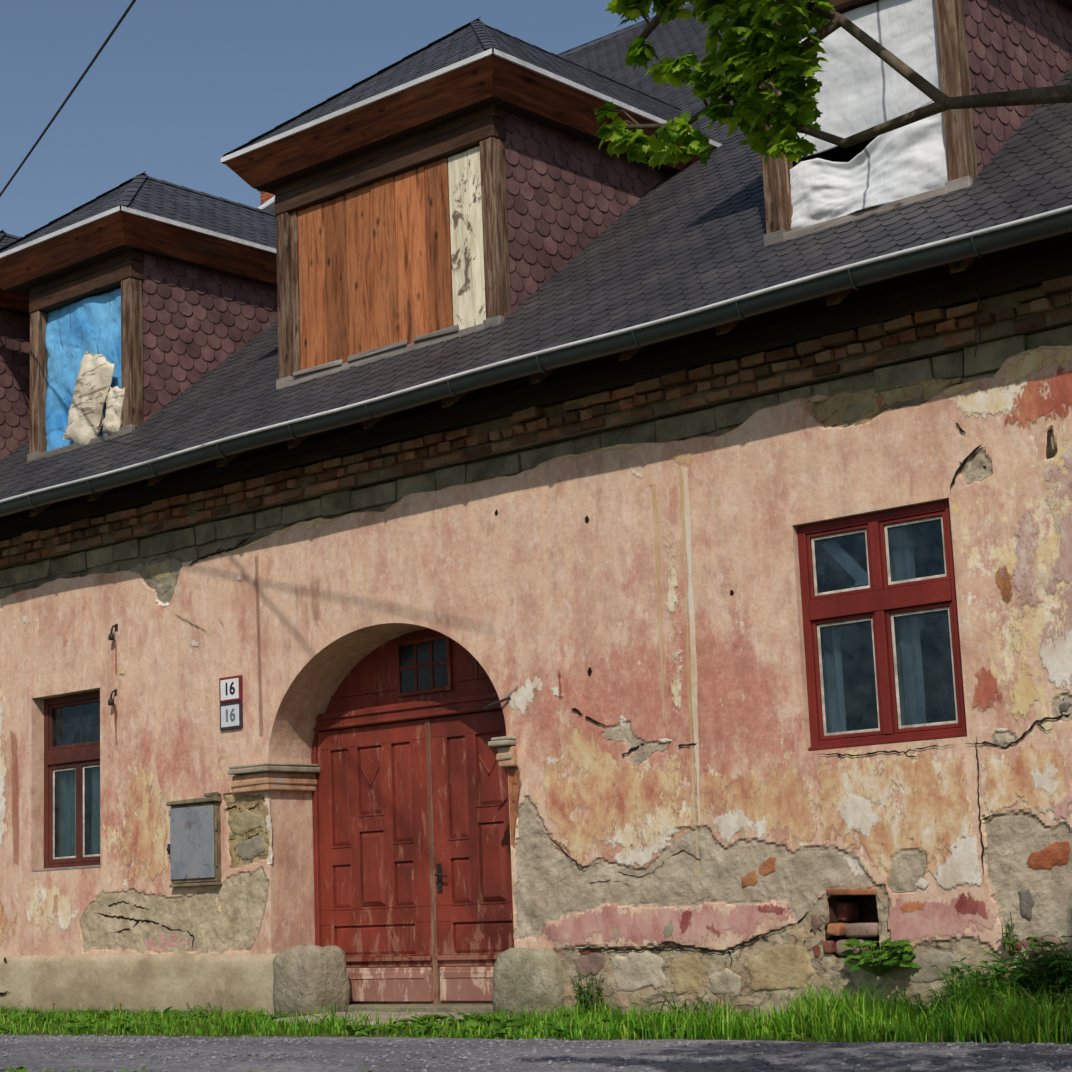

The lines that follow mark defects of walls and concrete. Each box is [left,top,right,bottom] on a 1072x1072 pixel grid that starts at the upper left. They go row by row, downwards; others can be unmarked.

spalling [0,325,1072,1019]
crack [571,708,606,727]
crack [622,742,644,757]
crack [816,696,1071,875]
crack [95,901,194,947]